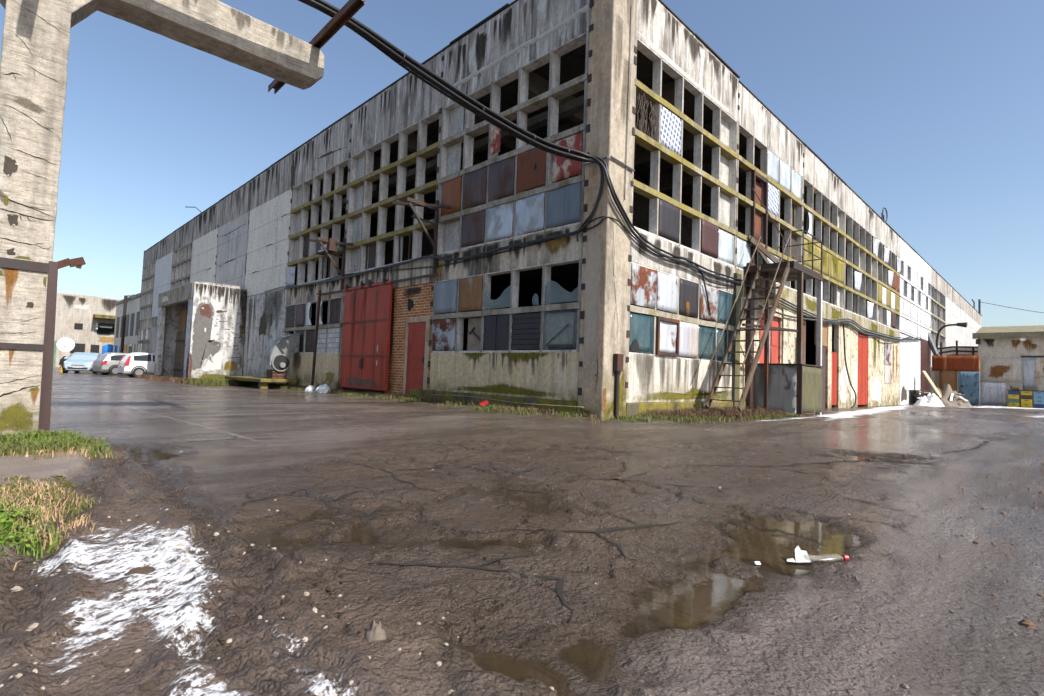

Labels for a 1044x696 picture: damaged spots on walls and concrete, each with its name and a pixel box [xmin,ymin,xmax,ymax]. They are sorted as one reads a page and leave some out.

crack [4,35,62,84]
leakage [232,9,251,28]
leakage [449,0,547,72]
leakage [618,23,630,109]
leakage [627,0,802,157]
crack [0,104,61,182]
leakage [815,157,839,190]
crack [0,195,53,249]
rust [4,268,18,301]
spalling [186,301,243,378]
spalling [259,312,272,336]